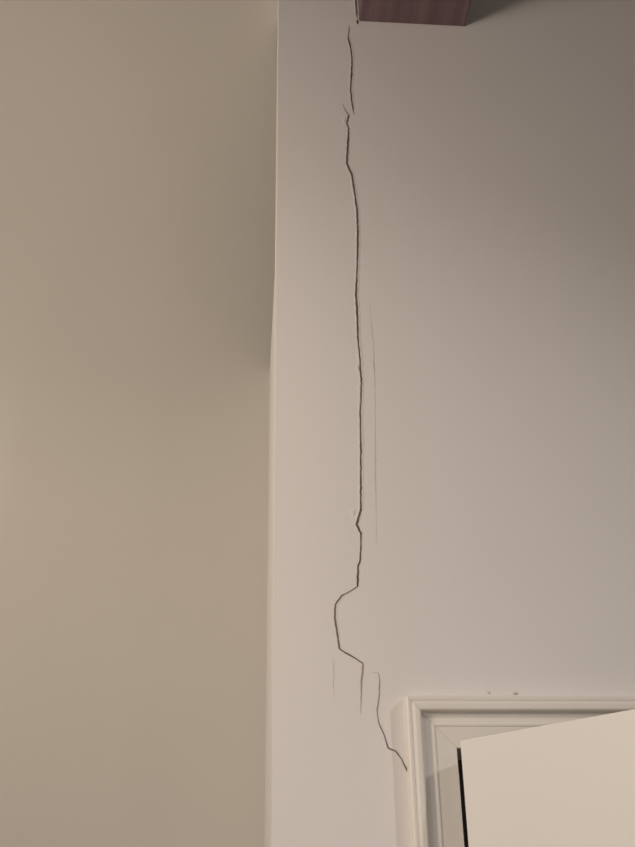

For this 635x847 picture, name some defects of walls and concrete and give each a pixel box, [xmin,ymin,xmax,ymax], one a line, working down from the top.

crack [333,30,407,771]